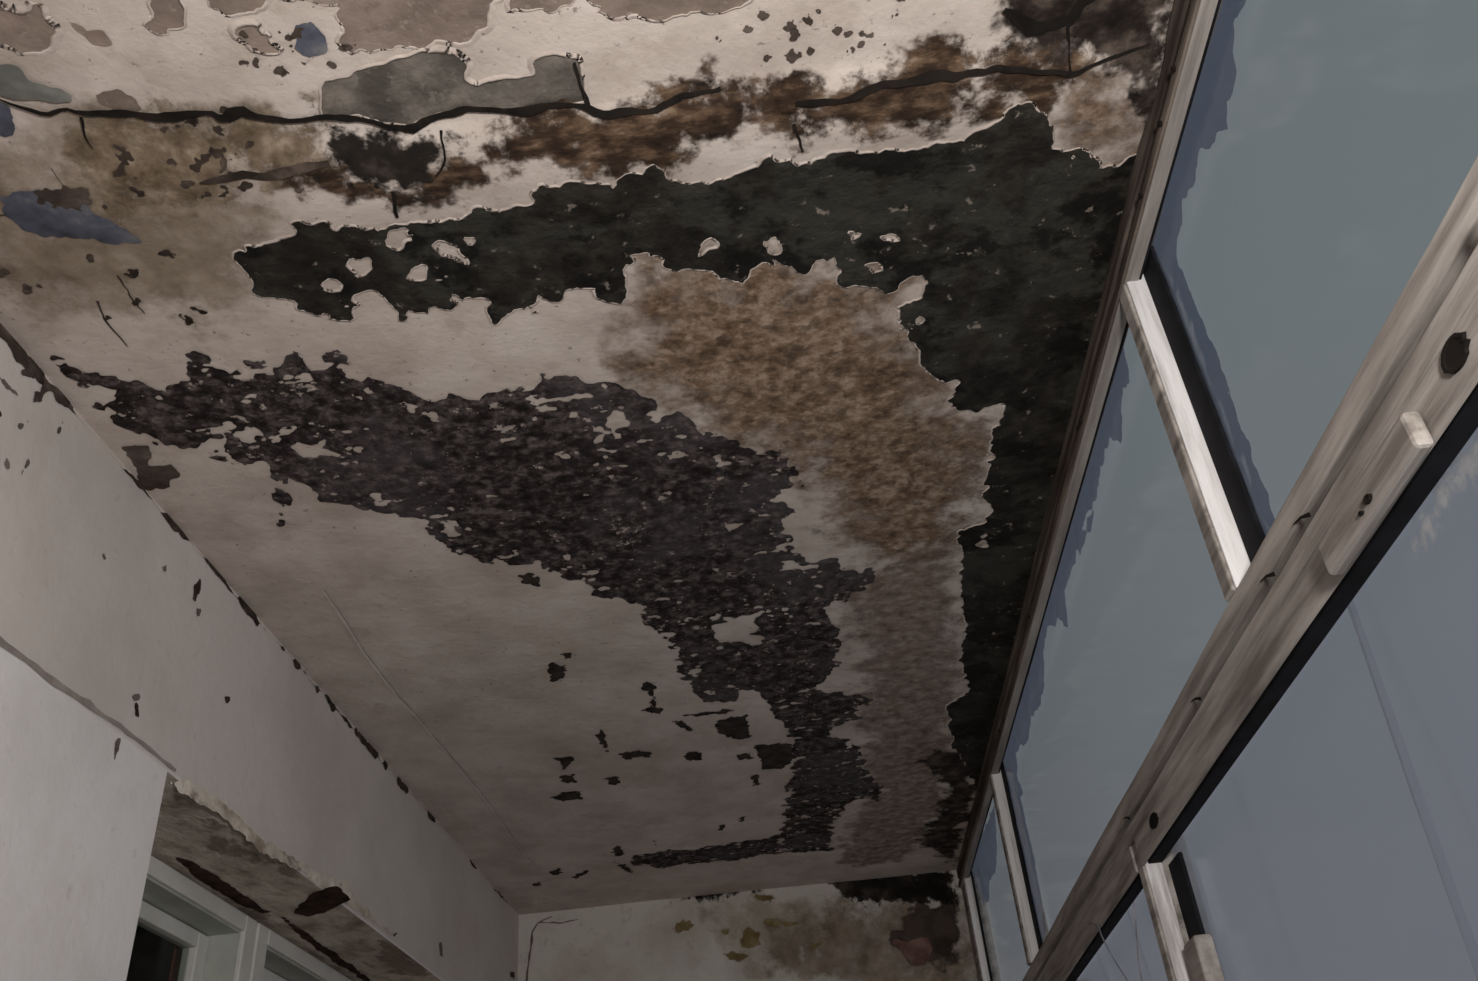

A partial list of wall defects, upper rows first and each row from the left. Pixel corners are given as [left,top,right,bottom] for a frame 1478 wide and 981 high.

peeling [0,0,112,103]
peeling [96,89,142,112]
peeling [142,0,187,36]
crack [0,62,721,177]
spalling [207,0,821,125]
spalling [832,24,886,59]
crack [792,0,1150,152]
crack [199,160,331,185]
crack [391,192,399,218]
crack [96,275,145,346]
damp [0,0,1175,981]
spalling [170,779,397,936]